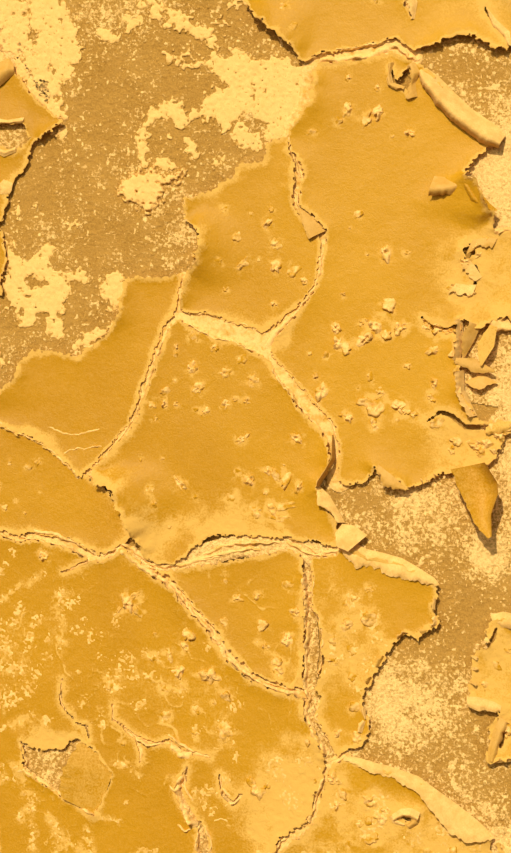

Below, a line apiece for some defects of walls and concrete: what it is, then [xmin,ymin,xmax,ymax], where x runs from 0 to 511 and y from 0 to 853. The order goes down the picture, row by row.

peeling [362,104,384,128]
peeling [374,8,511,298]
peeling [0,0,308,394]
crack [0,38,423,493]
peeling [382,298,397,313]
peeling [316,316,511,853]
peeling [55,587,104,644]
peeling [180,627,211,653]
peeling [97,647,187,698]
crack [0,529,351,853]
peeling [214,720,242,764]
peeling [191,772,231,816]